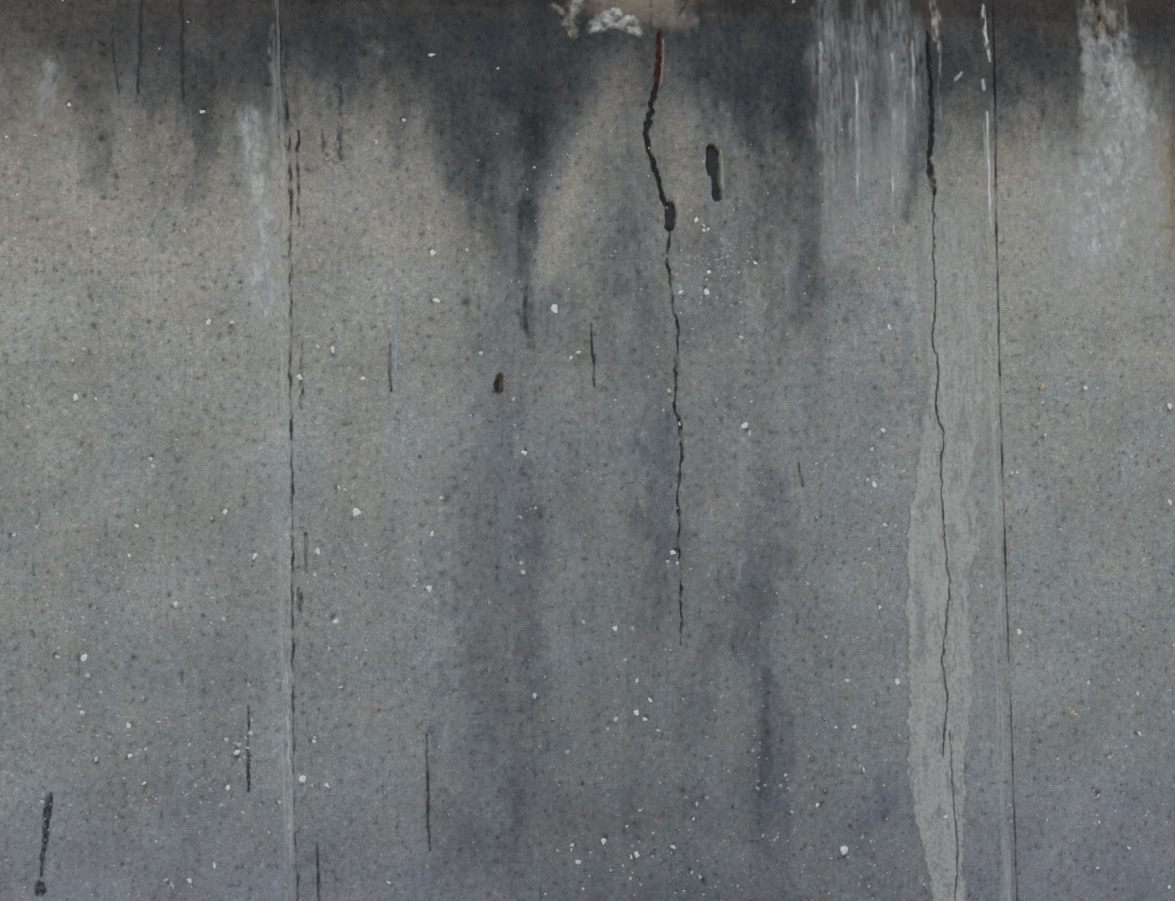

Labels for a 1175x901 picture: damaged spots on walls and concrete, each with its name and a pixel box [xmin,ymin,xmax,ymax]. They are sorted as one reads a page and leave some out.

peeling [570,0,688,34]
crack [643,29,666,206]
spalling [706,146,723,201]
crack [926,38,948,564]
water stain [1045,1,1154,278]
crack [673,315,683,626]